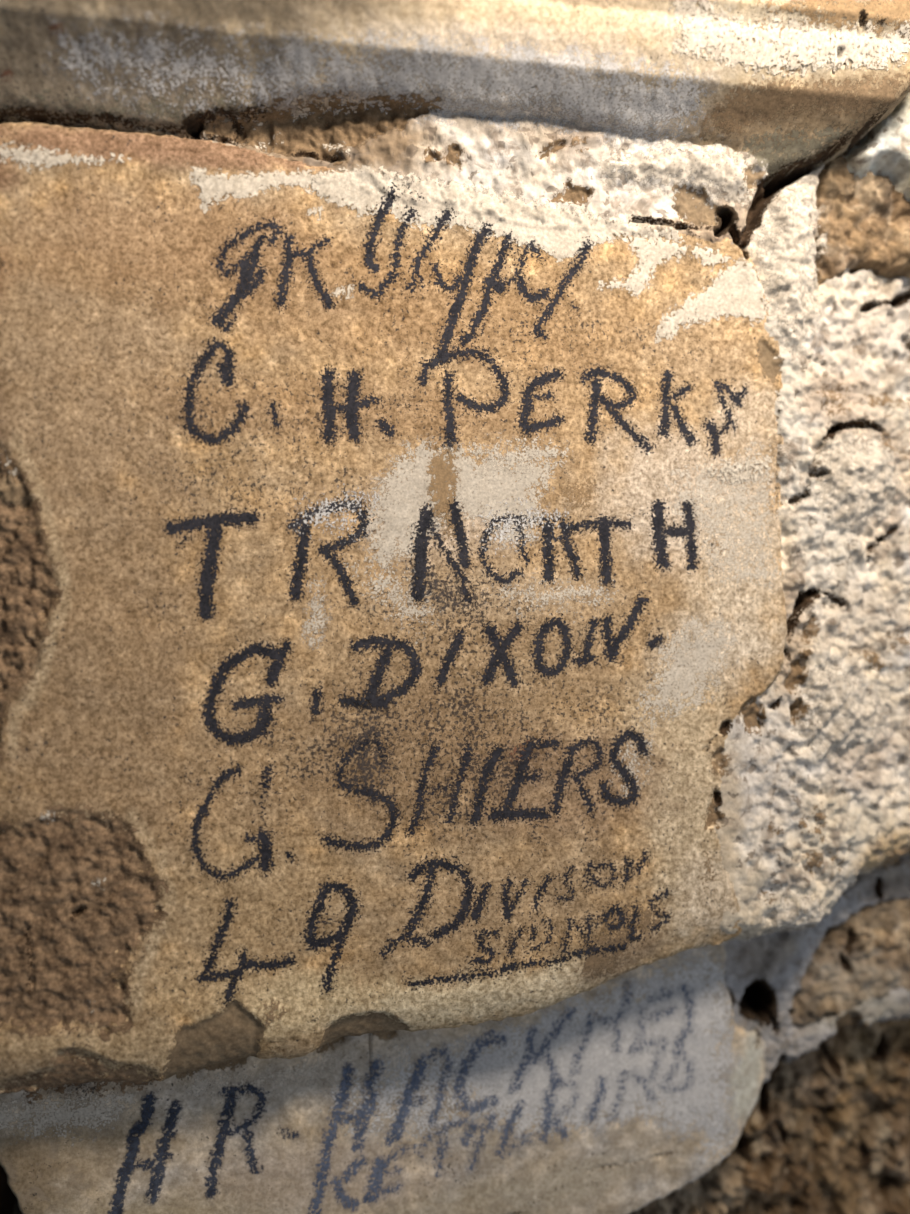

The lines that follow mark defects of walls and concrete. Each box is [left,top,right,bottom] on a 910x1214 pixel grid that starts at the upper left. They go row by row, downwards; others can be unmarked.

efflorescence [48,13,707,154]
crack [740,108,889,246]